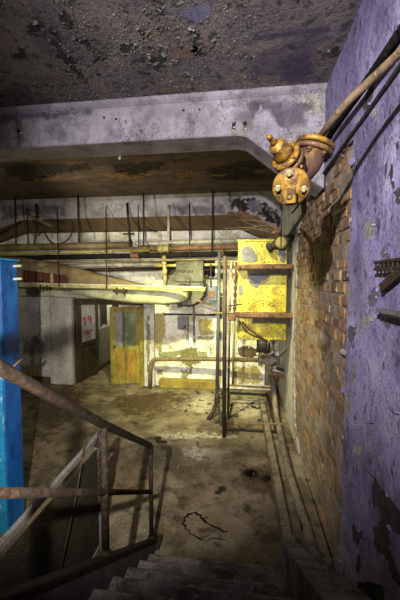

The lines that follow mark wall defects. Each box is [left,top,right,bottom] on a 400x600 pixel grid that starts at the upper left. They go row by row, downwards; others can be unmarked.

leakage [248,101,312,126]
leakage [146,312,166,372]
leakage [180,346,201,375]
leakage [199,317,214,336]
flaking render [278,144,379,560]
crack [181,512,230,543]
peeling [371,478,400,588]
spalling [356,553,384,600]